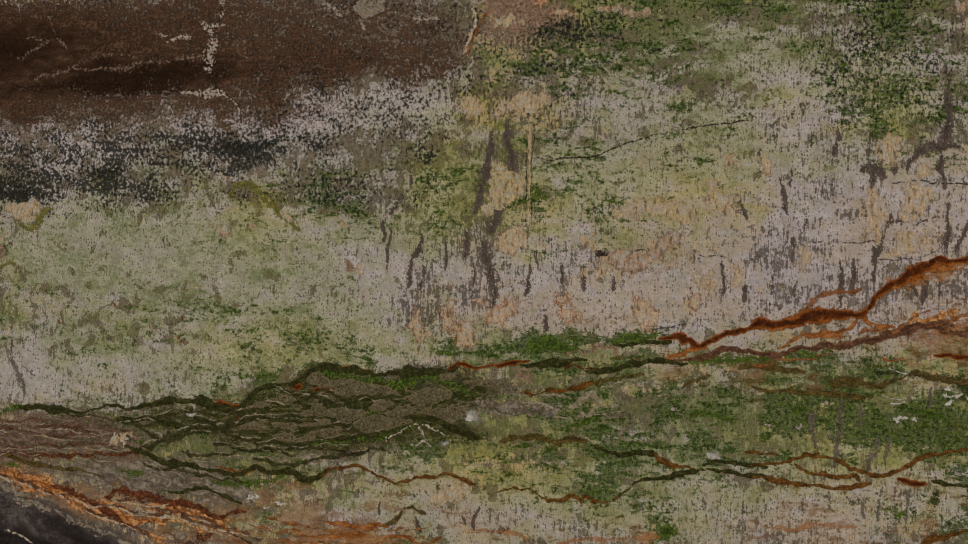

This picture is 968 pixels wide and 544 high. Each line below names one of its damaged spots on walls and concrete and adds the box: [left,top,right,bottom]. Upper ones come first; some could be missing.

water stain [0,0,479,166]
water stain [860,64,963,190]
water stain [379,167,414,275]
water stain [405,233,426,290]
water stain [463,118,521,308]
water stain [523,250,538,296]
corrosion [448,255,968,371]
water stain [778,167,794,215]
water stain [837,258,859,309]
water stain [871,202,968,282]
corrosion [0,417,479,544]
corrosion [496,433,968,504]